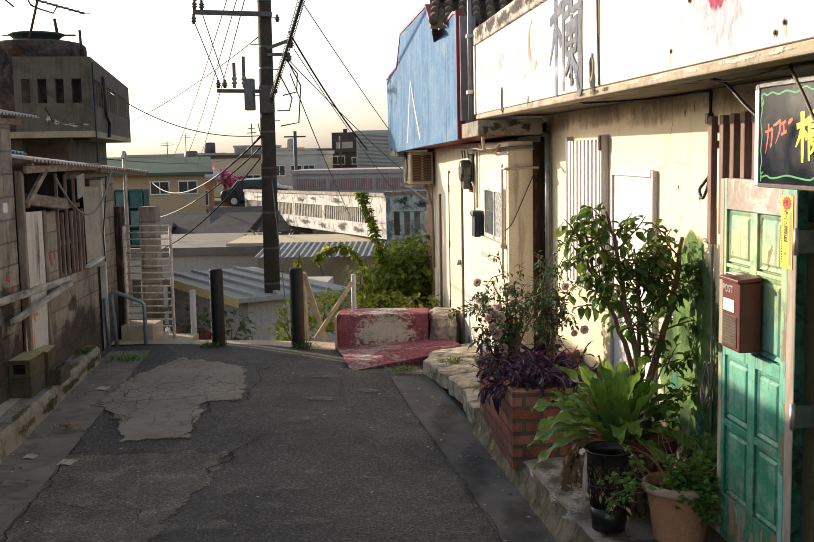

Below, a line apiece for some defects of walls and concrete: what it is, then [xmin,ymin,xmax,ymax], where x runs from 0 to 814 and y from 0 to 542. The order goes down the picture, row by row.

leakage [475,0,534,38]
peeling [351,316,417,346]
spalling [429,230,485,351]
crack [1,364,266,542]